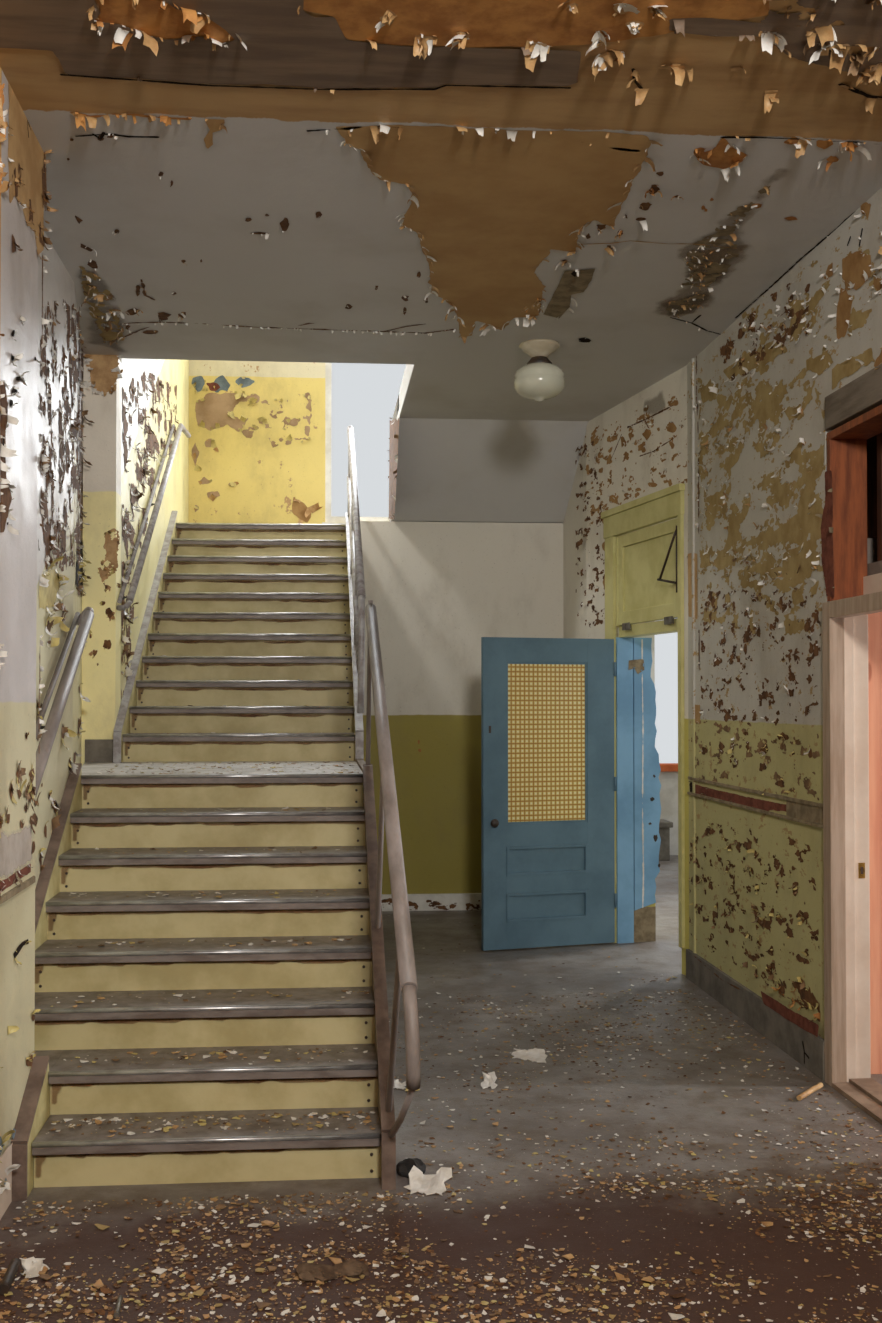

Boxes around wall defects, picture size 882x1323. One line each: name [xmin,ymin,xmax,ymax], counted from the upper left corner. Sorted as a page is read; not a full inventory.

peeling [0,0,882,114]
peeling [336,125,684,343]
peeling [666,186,770,318]
peeling [690,138,748,182]
peeling [784,136,872,172]
peeling [854,202,871,218]
peeling [0,82,312,897]
peeling [575,231,882,815]
flaking render [689,822,820,1037]